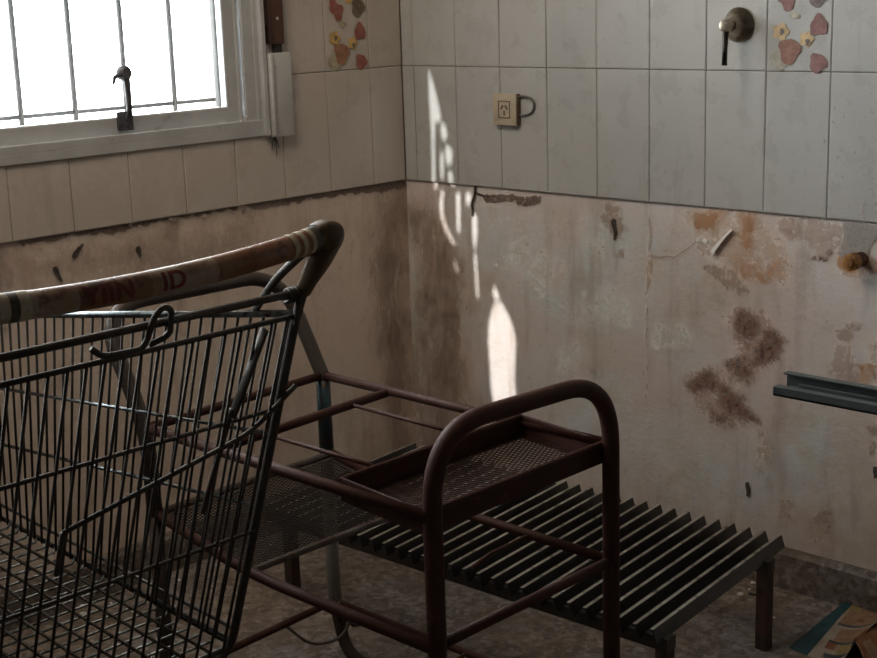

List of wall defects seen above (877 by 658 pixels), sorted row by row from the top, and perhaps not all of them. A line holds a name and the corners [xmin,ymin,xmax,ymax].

peeling [483,194,541,206]
flaking render [602,204,622,241]
flaking render [697,229,732,255]
water stain [371,183,466,449]
water stain [726,309,784,379]
water stain [687,369,759,426]